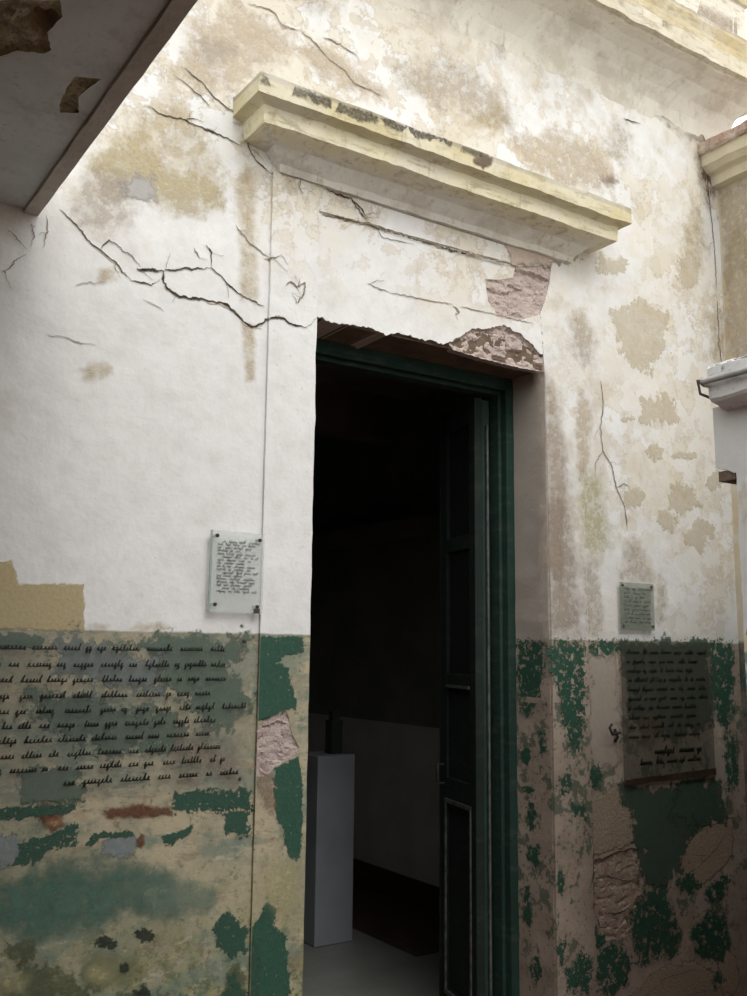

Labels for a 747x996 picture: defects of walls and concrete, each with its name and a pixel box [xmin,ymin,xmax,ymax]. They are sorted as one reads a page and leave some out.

spalling [0,0,62,56]
spalling [59,76,100,113]
crack [253,4,383,101]
crack [148,68,509,264]
crack [3,210,315,329]
spalling [446,244,561,374]
crack [595,384,630,524]
peeling [0,560,306,996]
peeling [516,632,740,996]